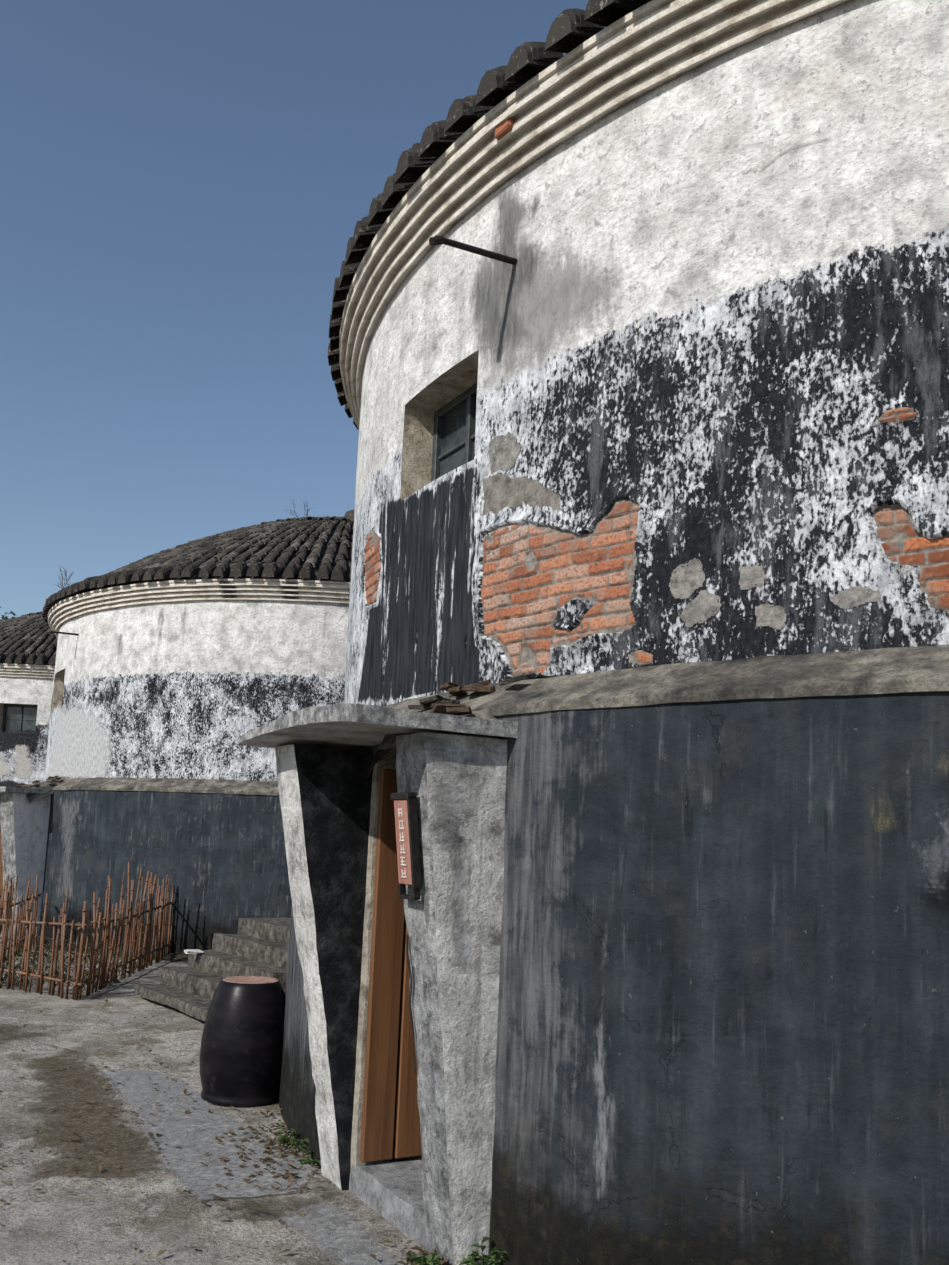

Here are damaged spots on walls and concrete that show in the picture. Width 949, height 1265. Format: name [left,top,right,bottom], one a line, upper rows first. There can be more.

leakage [472,192,608,366]
flaking render [868,398,928,433]
flaking render [467,432,721,684]
flaking render [821,437,949,647]
leakage [0,780,24,788]
flaking render [0,745,34,779]
leakage [0,729,39,751]
leakage [489,1209,566,1265]